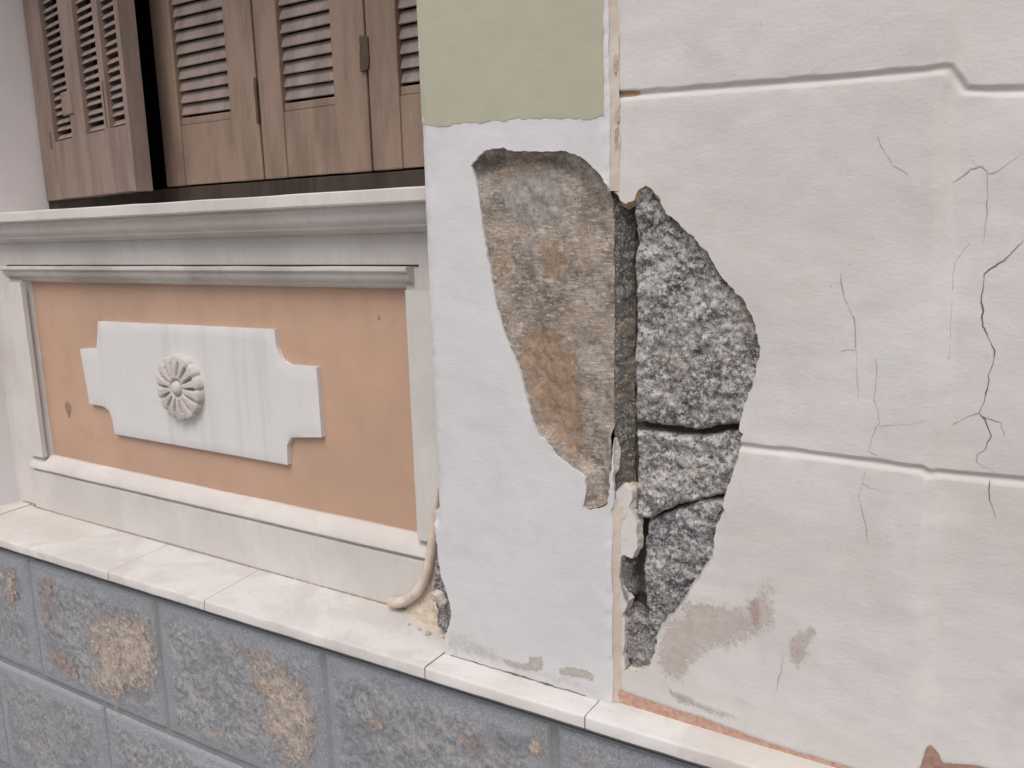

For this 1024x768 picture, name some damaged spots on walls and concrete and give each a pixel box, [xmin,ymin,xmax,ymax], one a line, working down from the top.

spalling [473,148,773,678]
crack [840,273,922,456]
crack [948,153,1023,360]
crack [954,240,1024,518]